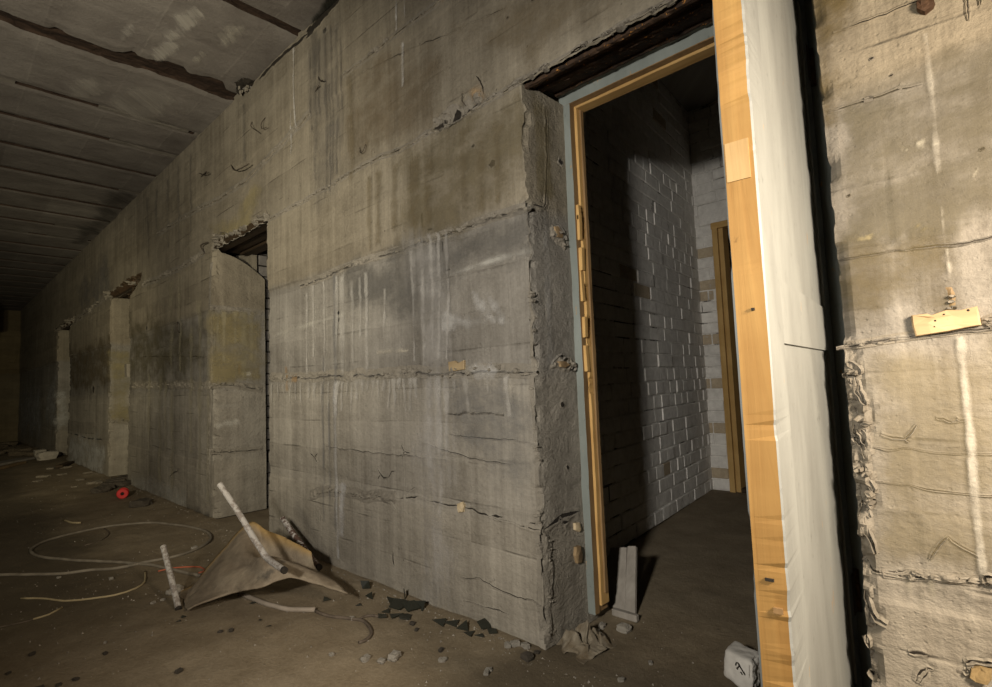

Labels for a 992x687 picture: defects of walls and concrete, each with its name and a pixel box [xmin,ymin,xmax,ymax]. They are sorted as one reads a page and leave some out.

spalling [430,91,489,133]
spalling [211,212,270,251]
leakage [348,246,461,313]
crack [872,416,992,456]
leakage [957,337,977,490]
crack [310,410,580,535]
spalling [842,342,889,687]
crack [875,480,992,498]
leakage [976,519,986,572]